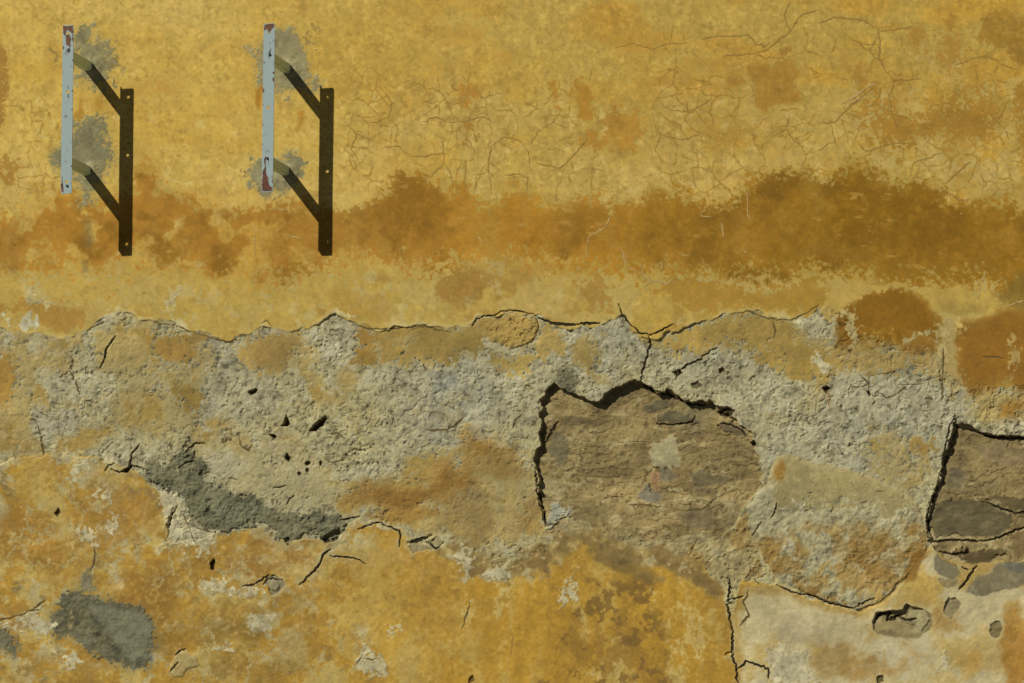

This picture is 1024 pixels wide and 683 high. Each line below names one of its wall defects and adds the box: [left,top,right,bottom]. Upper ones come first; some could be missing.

crack [618,5,971,201]
corrosion [262,157,273,191]
water stain [0,166,1024,399]
crack [157,322,238,343]
crack [358,324,449,332]
crack [733,306,818,337]
spalling [0,306,1024,619]
crack [861,350,1024,589]
crack [534,472,568,527]
crack [243,550,365,587]
crack [726,576,915,683]
spalling [874,604,933,639]